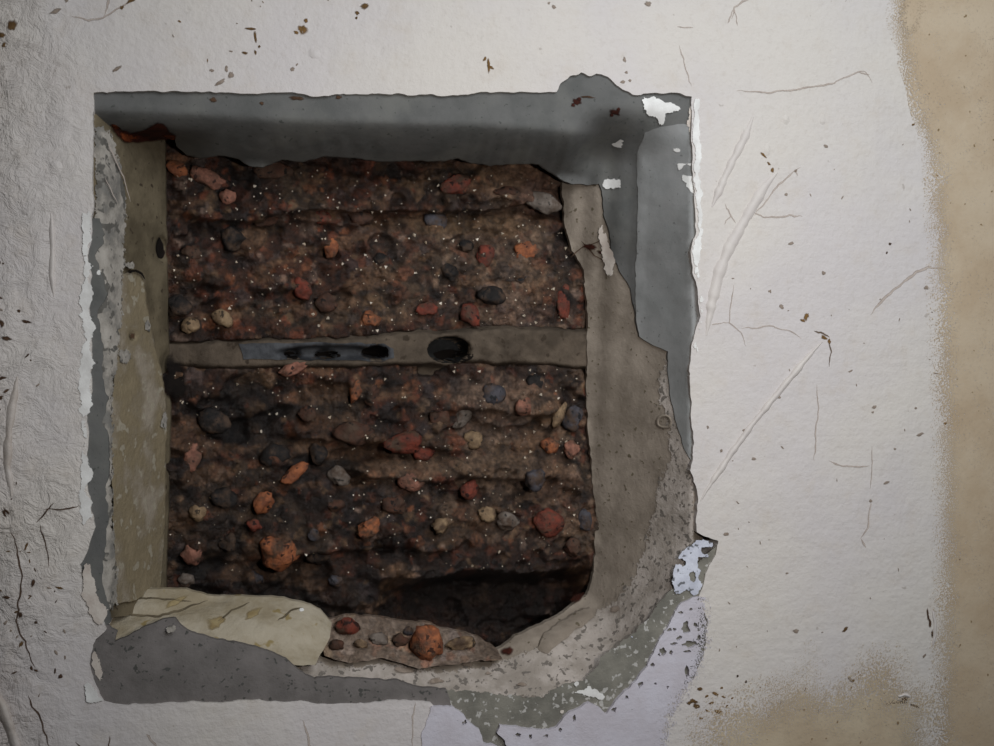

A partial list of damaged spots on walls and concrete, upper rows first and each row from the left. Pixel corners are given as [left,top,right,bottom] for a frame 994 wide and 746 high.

crack [737,71,871,94]
crack [724,167,801,225]
crack [872,266,946,313]
crack [712,285,832,363]
spalling [78,57,733,746]
crack [814,394,873,547]
crack [36,503,78,567]
crack [11,533,35,667]
crack [28,696,49,746]